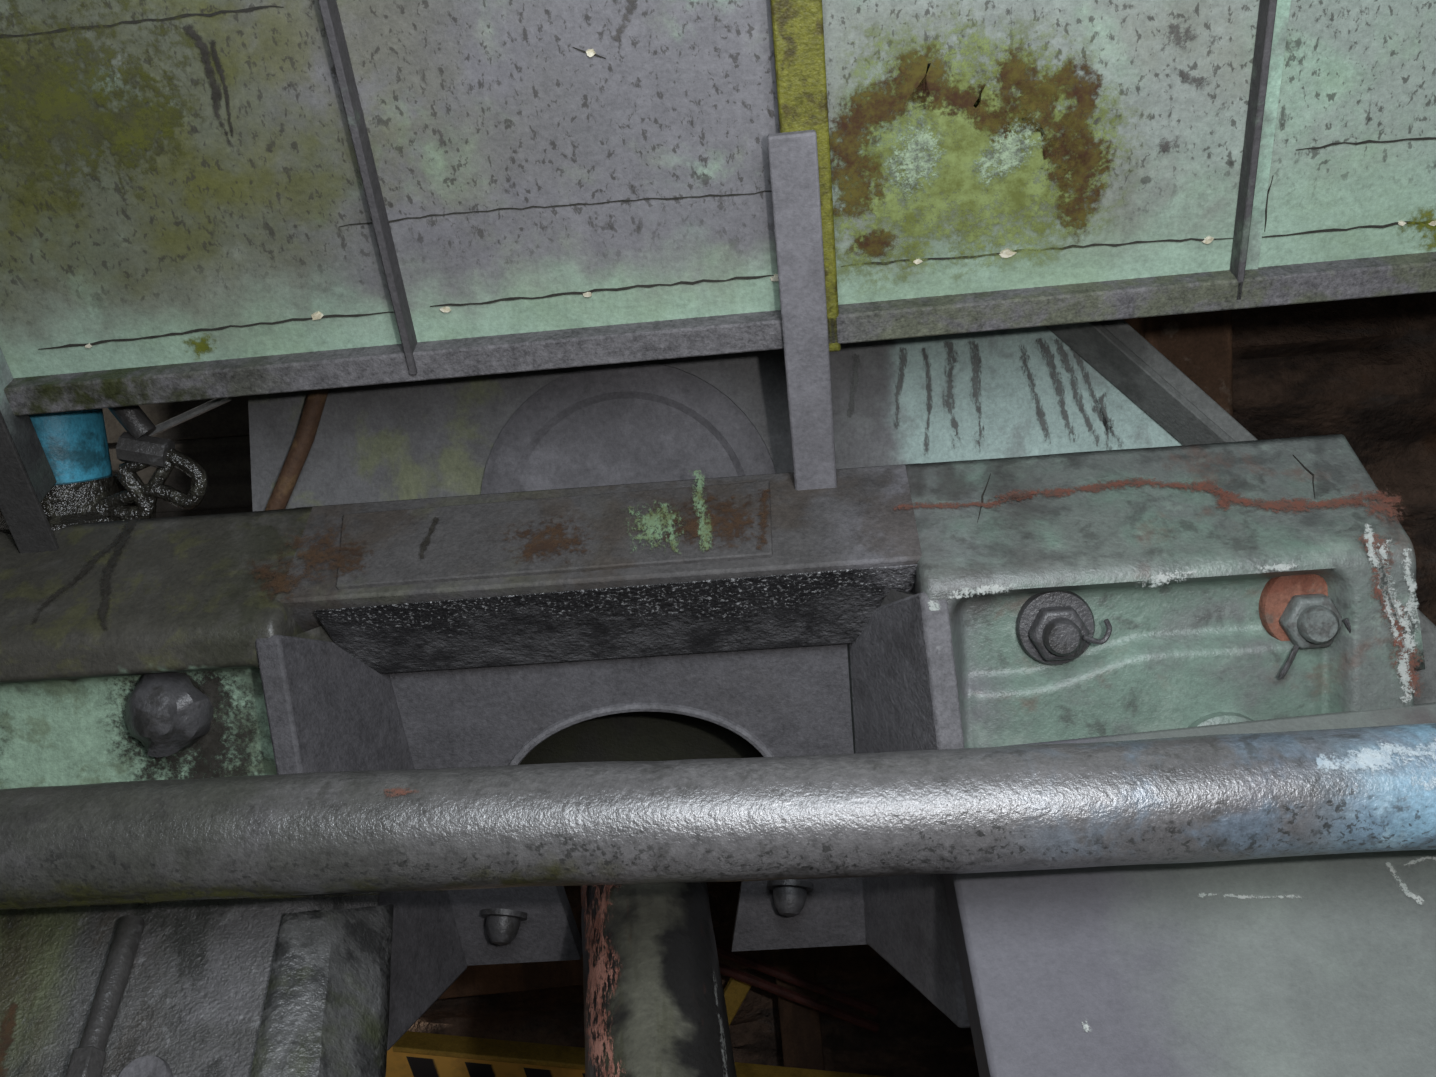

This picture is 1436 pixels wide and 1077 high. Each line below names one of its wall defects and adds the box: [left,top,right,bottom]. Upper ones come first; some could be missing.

water stain [184,24,233,144]
water stain [829,25,1128,277]
water stain [1402,209,1436,249]
rust [505,521,590,561]
rust [628,470,770,552]
rust [894,477,1404,521]